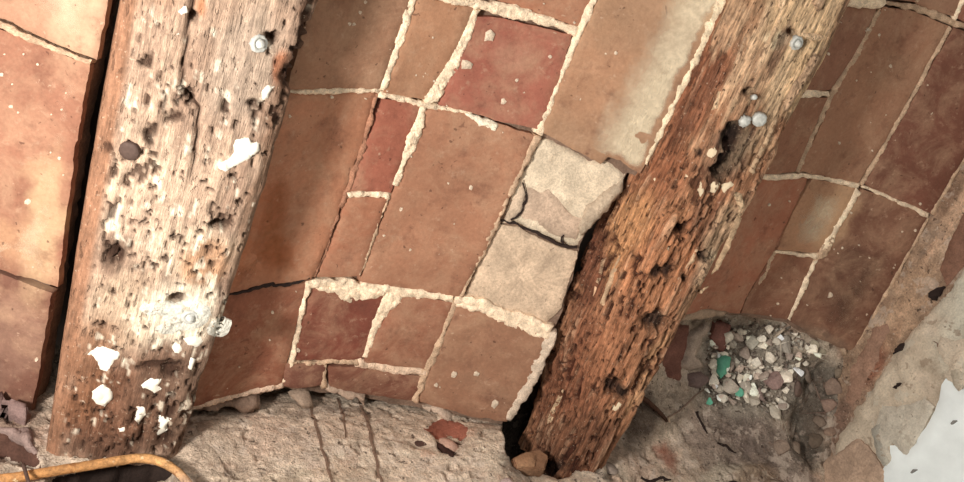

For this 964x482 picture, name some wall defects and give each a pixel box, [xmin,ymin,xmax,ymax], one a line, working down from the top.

crack [500,182,577,249]
spalling [662,309,726,389]
flaking render [938,336,964,391]
spalling [0,391,41,469]
spalling [52,464,172,482]
crack [310,409,333,482]
crack [336,398,384,482]
flaking render [823,399,936,482]